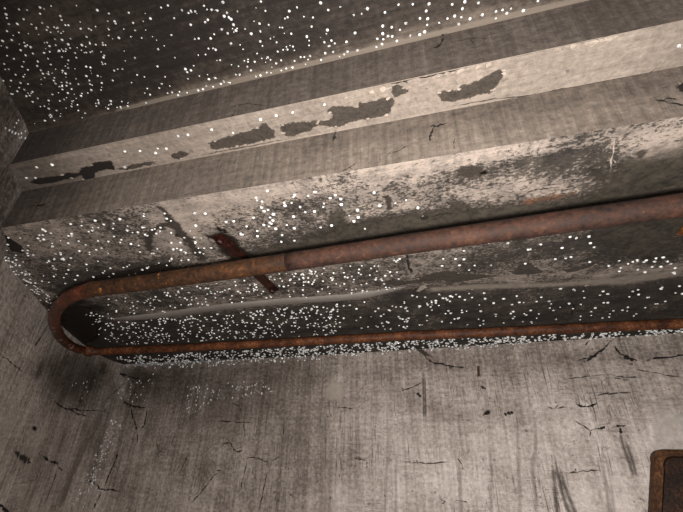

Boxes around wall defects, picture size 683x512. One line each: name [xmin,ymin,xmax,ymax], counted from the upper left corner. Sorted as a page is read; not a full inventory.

spalling [430,62,506,102]
spalling [208,85,411,150]
spalling [31,160,156,185]
leakage [208,150,683,261]
crack [423,354,464,369]
crack [549,340,683,435]